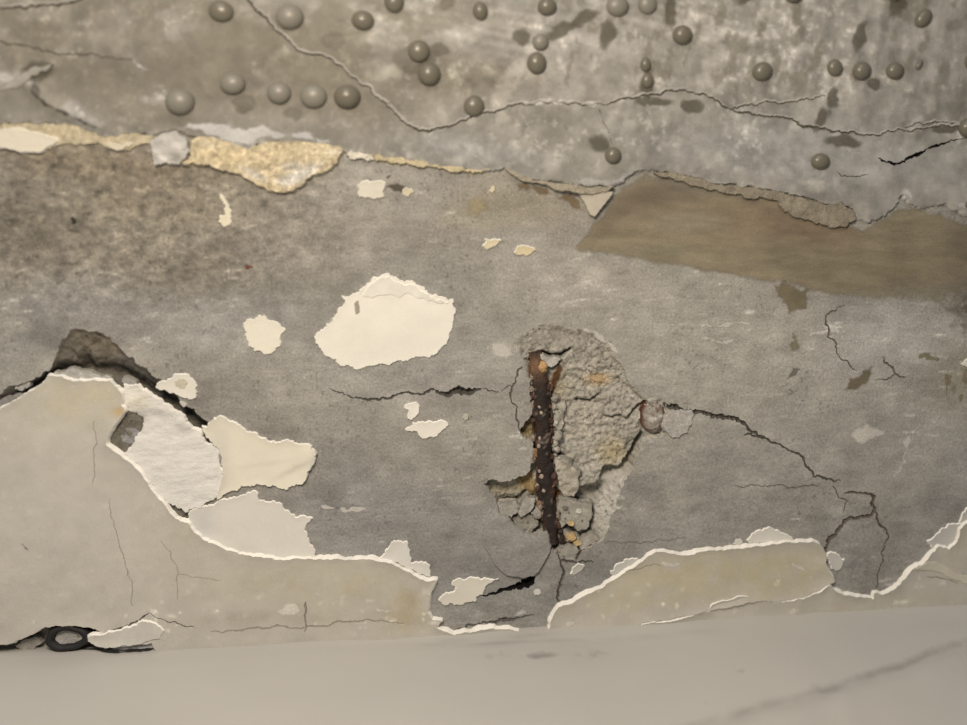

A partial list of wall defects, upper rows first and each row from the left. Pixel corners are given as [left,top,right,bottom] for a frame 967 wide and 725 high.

peeling [0,0,967,228]
crack [247,0,967,177]
peeling [0,328,519,652]
peeling [314,273,456,370]
crack [328,366,523,432]
corrosion [520,350,566,545]
spalling [513,323,695,575]
peeling [547,507,967,630]
damp [577,174,967,312]
crack [663,403,889,589]
damp [848,370,870,389]
crack [825,306,905,381]